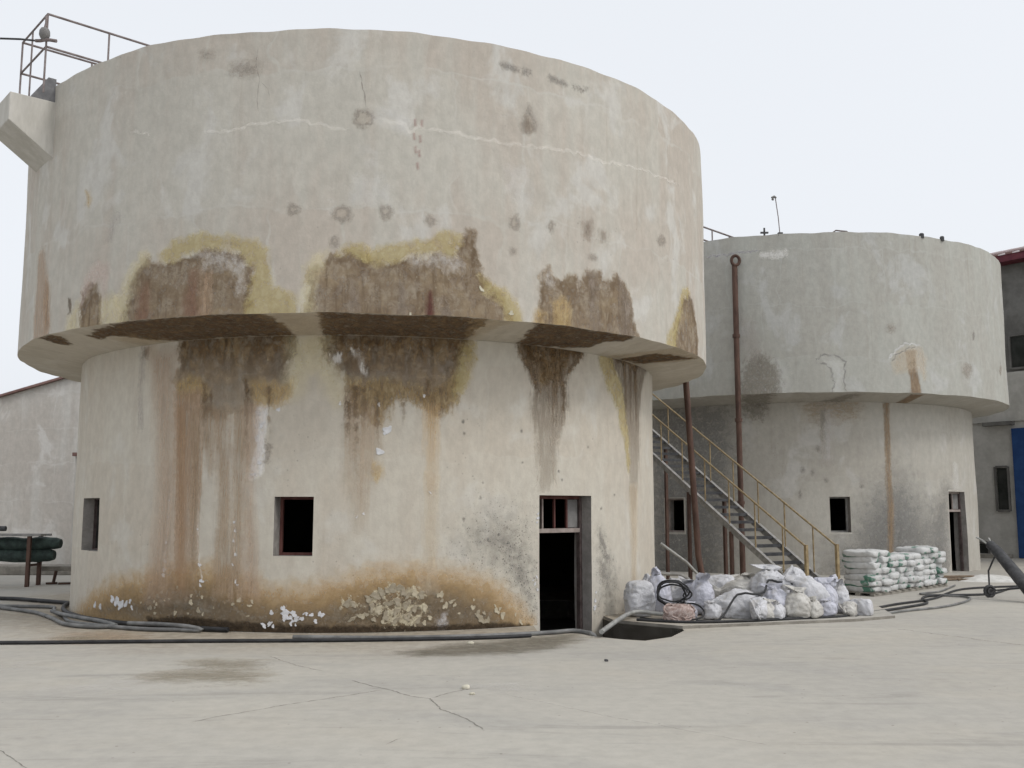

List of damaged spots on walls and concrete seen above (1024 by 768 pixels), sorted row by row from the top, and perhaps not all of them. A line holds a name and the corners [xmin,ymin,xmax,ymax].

damp [77,229,698,656]
damp [741,354,780,417]
rust [883,347,922,553]
peeling [339,582,523,626]